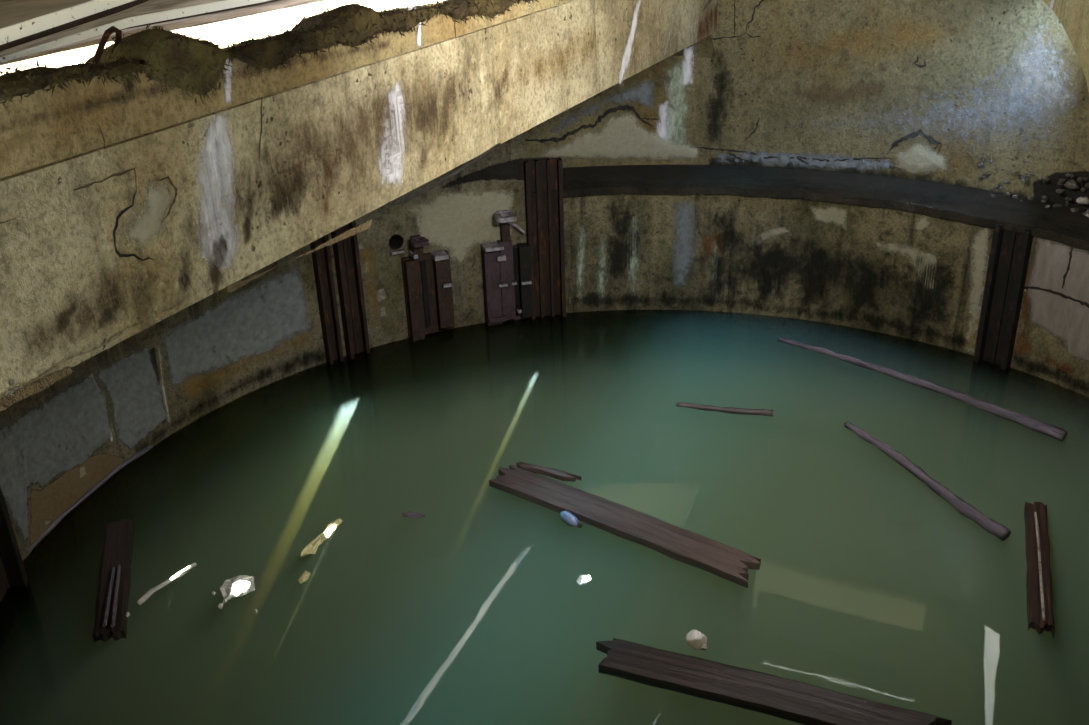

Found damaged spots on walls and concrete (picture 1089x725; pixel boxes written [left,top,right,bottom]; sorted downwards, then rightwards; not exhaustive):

efflorescence [619,0,641,84]
crack [707,0,763,40]
crack [73,168,177,261]
damp [199,115,255,299]
damp [271,170,303,218]
flaking render [387,114,698,206]
crack [525,105,661,143]
peeling [553,81,653,131]
damp [573,202,988,353]
crack [1023,247,1089,308]